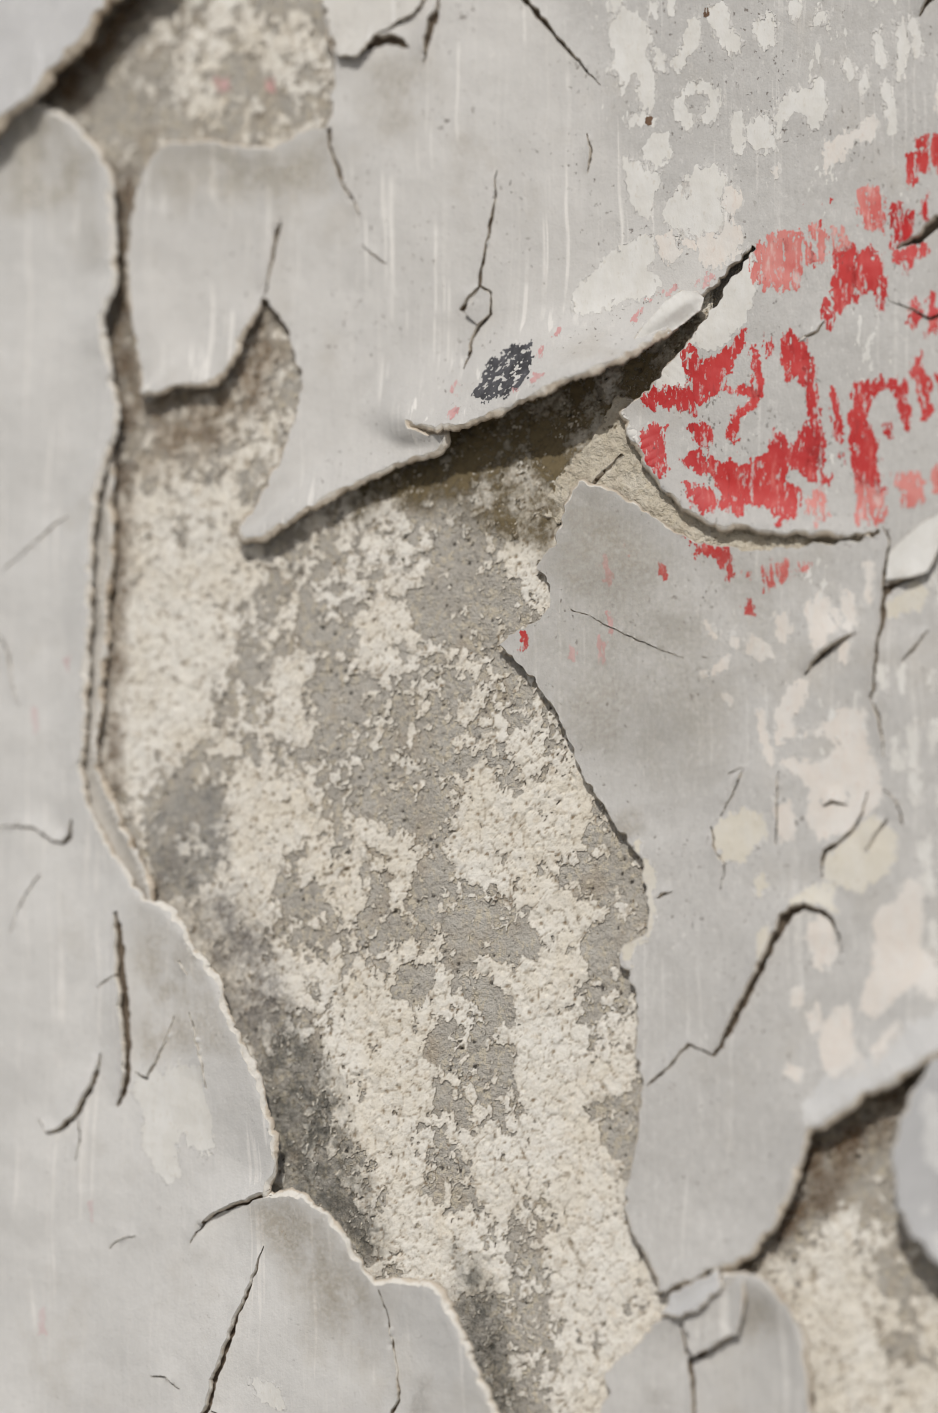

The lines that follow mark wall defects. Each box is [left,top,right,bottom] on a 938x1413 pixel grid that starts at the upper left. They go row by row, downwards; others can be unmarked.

crack [344,0,440,63]
crack [522,0,598,83]
peeling [696,347,722,364]
peeling [886,581,910,602]
crack [804,529,928,748]
crack [647,789,904,1086]
crack [43,912,162,1161]
peeling [918,1086,938,1176]
peeling [919,1201,933,1219]
peeling [930,1227,938,1258]
crack [152,1247,264,1413]
crack [378,1290,401,1413]